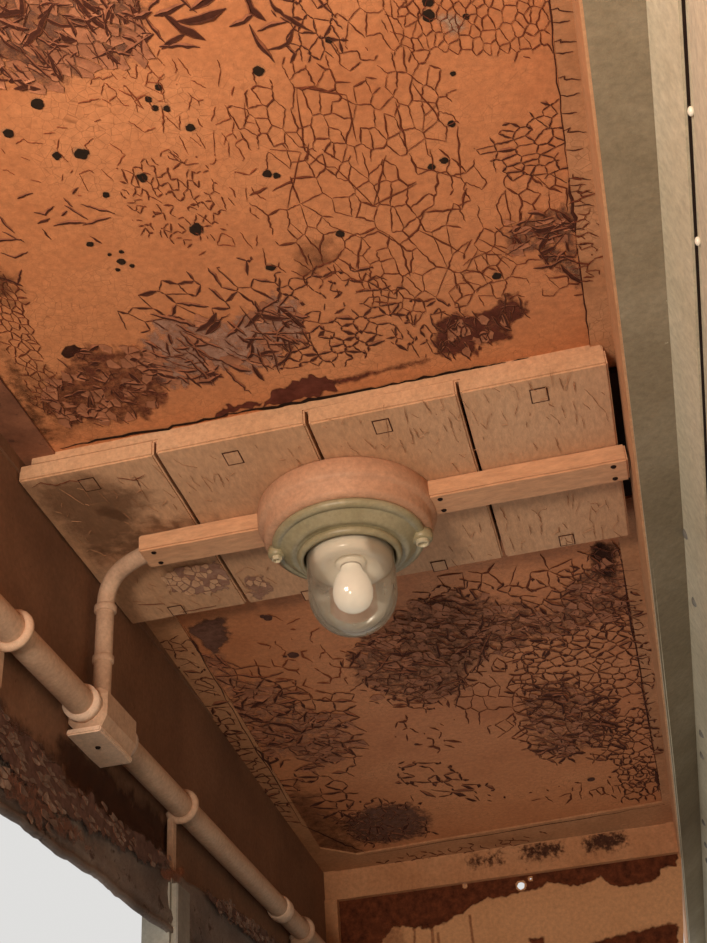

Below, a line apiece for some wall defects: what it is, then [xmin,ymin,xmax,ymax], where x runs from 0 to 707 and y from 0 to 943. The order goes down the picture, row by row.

peeling [0,0,155,110]
peeling [495,207,581,283]
peeling [40,296,313,429]
peeling [434,293,530,361]
crack [32,456,234,556]
peeling [201,653,368,773]
crack [133,496,664,864]
peeling [345,541,633,708]
peeling [516,678,625,758]
peeling [0,709,171,868]